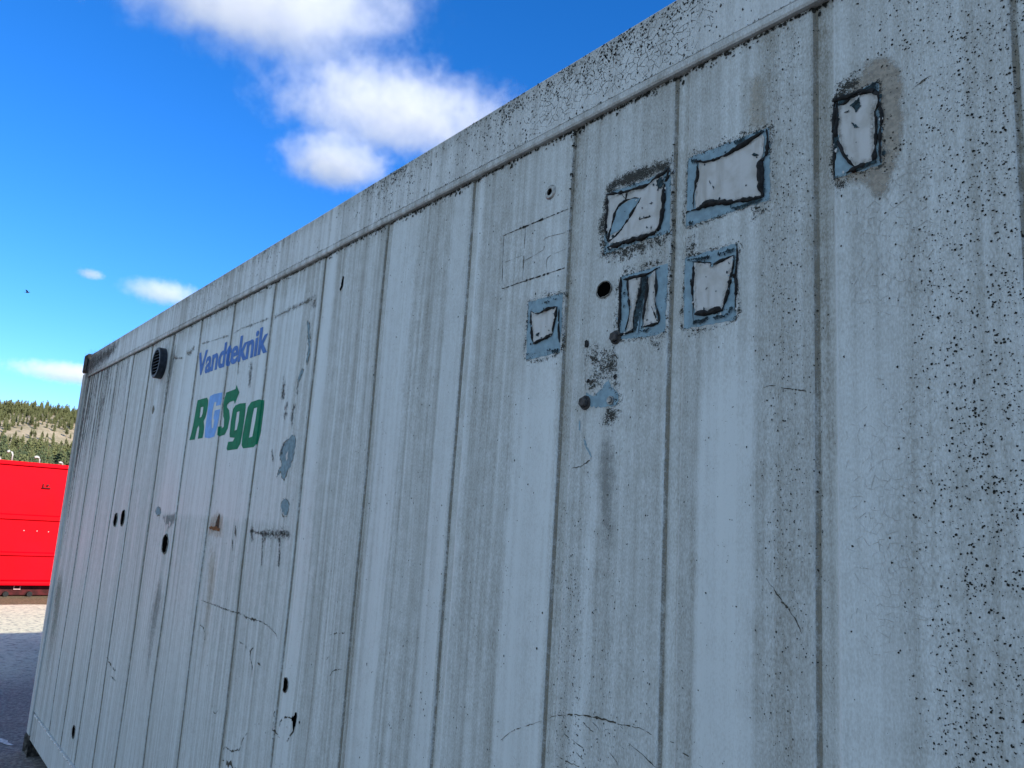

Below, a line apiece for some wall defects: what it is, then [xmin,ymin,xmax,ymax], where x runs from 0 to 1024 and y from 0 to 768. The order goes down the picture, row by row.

crack [519,0,712,141]
peeling [829,79,886,181]
peeling [604,124,775,256]
peeling [523,292,568,363]
peeling [616,241,743,343]
peeling [271,320,311,481]
peeling [578,355,622,457]
water stain [813,0,1024,768]
water stain [756,433,829,677]
crack [200,601,278,668]
crack [501,714,702,768]